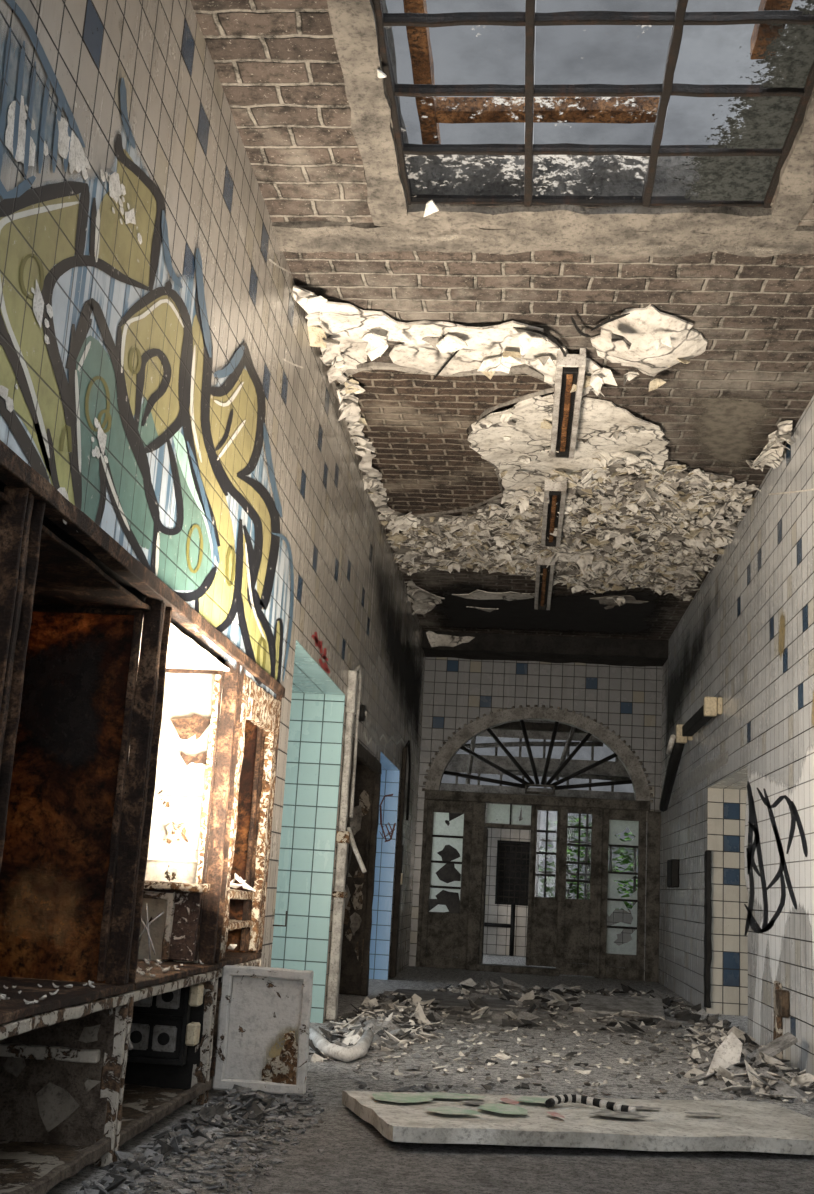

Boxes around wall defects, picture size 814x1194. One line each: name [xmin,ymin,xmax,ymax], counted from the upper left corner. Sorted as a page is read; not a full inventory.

peeling [292,285,761,616]
peeling [746,420,795,472]
corrosion [19,632,106,770]
peeling [230,873,256,891]
peeling [78,1025,100,1043]
corrosion [261,1029,306,1085]
peeling [36,1082,79,1132]